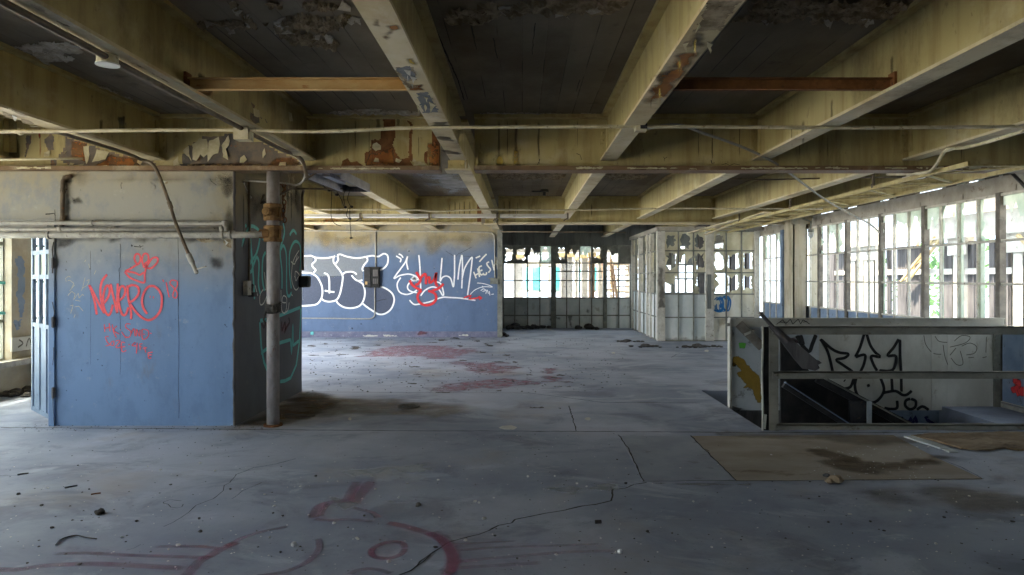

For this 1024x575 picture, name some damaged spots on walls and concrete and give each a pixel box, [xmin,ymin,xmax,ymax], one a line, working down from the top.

spalling [265,0,362,36]
corrosion [646,34,703,102]
peeling [2,108,156,169]
peeling [173,133,302,166]
peeling [322,66,439,170]
water stain [280,393,458,423]
water stain [808,435,949,474]
crack [399,435,647,575]